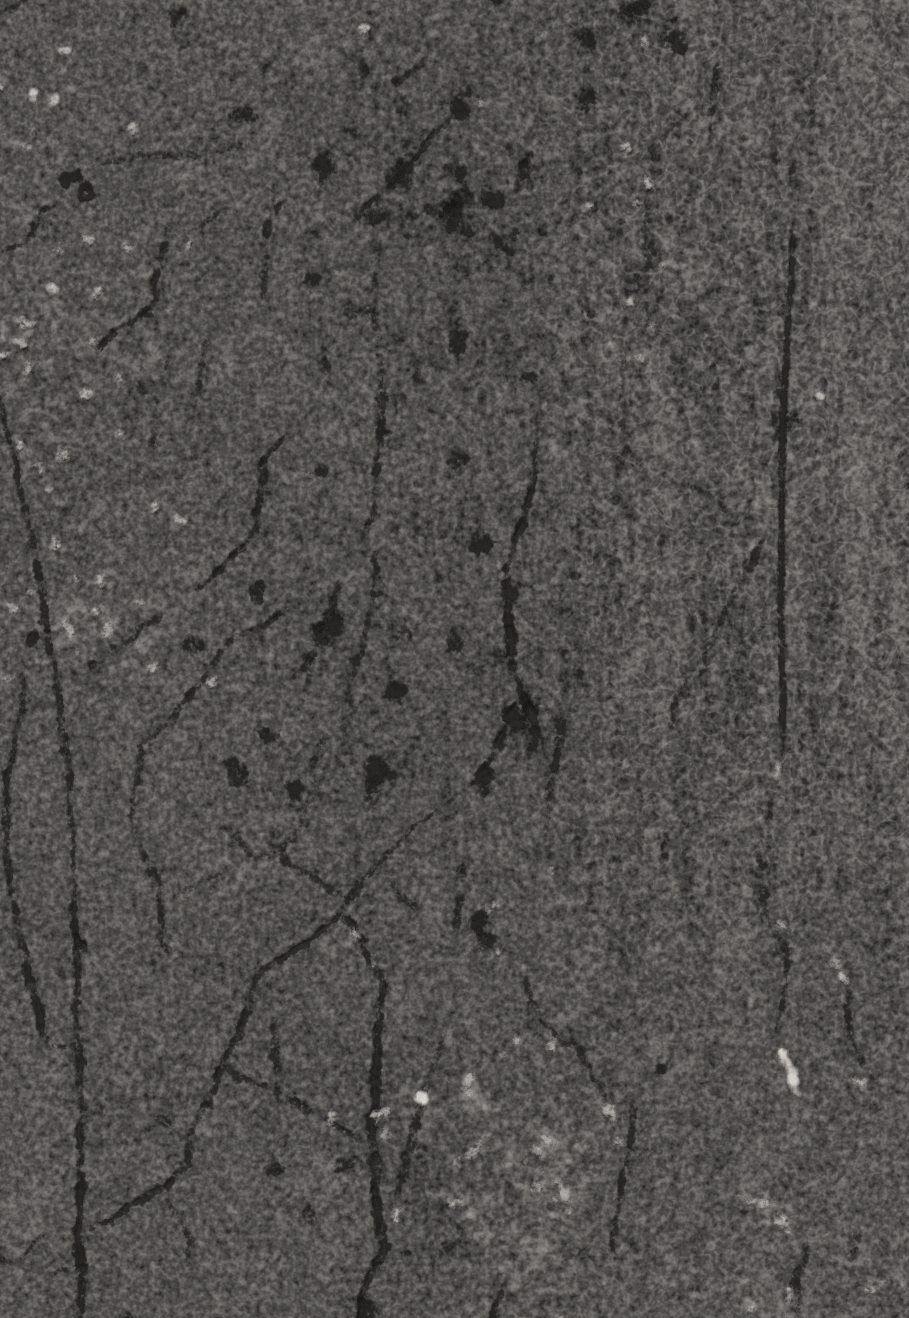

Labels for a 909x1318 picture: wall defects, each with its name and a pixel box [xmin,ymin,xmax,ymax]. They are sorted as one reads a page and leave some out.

crack [2,206,47,252]
crack [97,227,168,351]
crack [260,188,286,298]
crack [164,340,209,391]
crack [326,272,391,713]
crack [706,228,797,756]
crack [669,677,687,729]
crack [0,396,564,1318]
crack [756,854,792,1033]
crack [843,978,875,1081]
crack [524,978,641,1252]
crack [789,1246,809,1311]